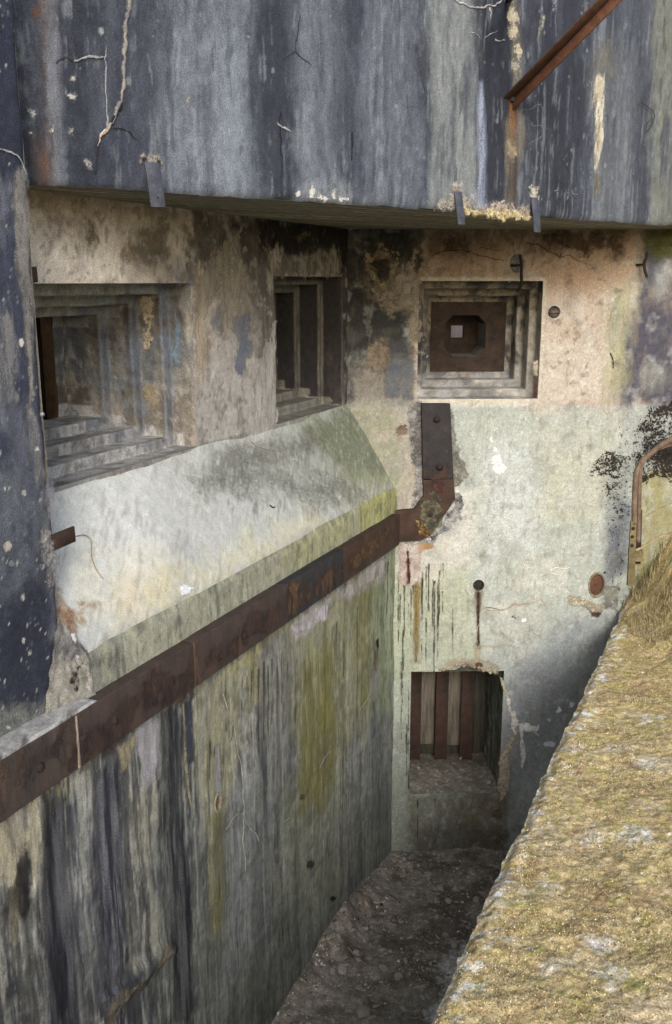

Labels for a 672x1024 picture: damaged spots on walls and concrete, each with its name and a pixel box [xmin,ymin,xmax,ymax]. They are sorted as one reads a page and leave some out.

crack [56,0,135,174]
spalling [437,182,540,222]
peeling [415,491,444,537]
rust [397,542,433,661]
rust [0,668,195,811]
leakage [241,655,288,740]
leakage [0,796,78,1024]
leakage [94,700,194,1023]